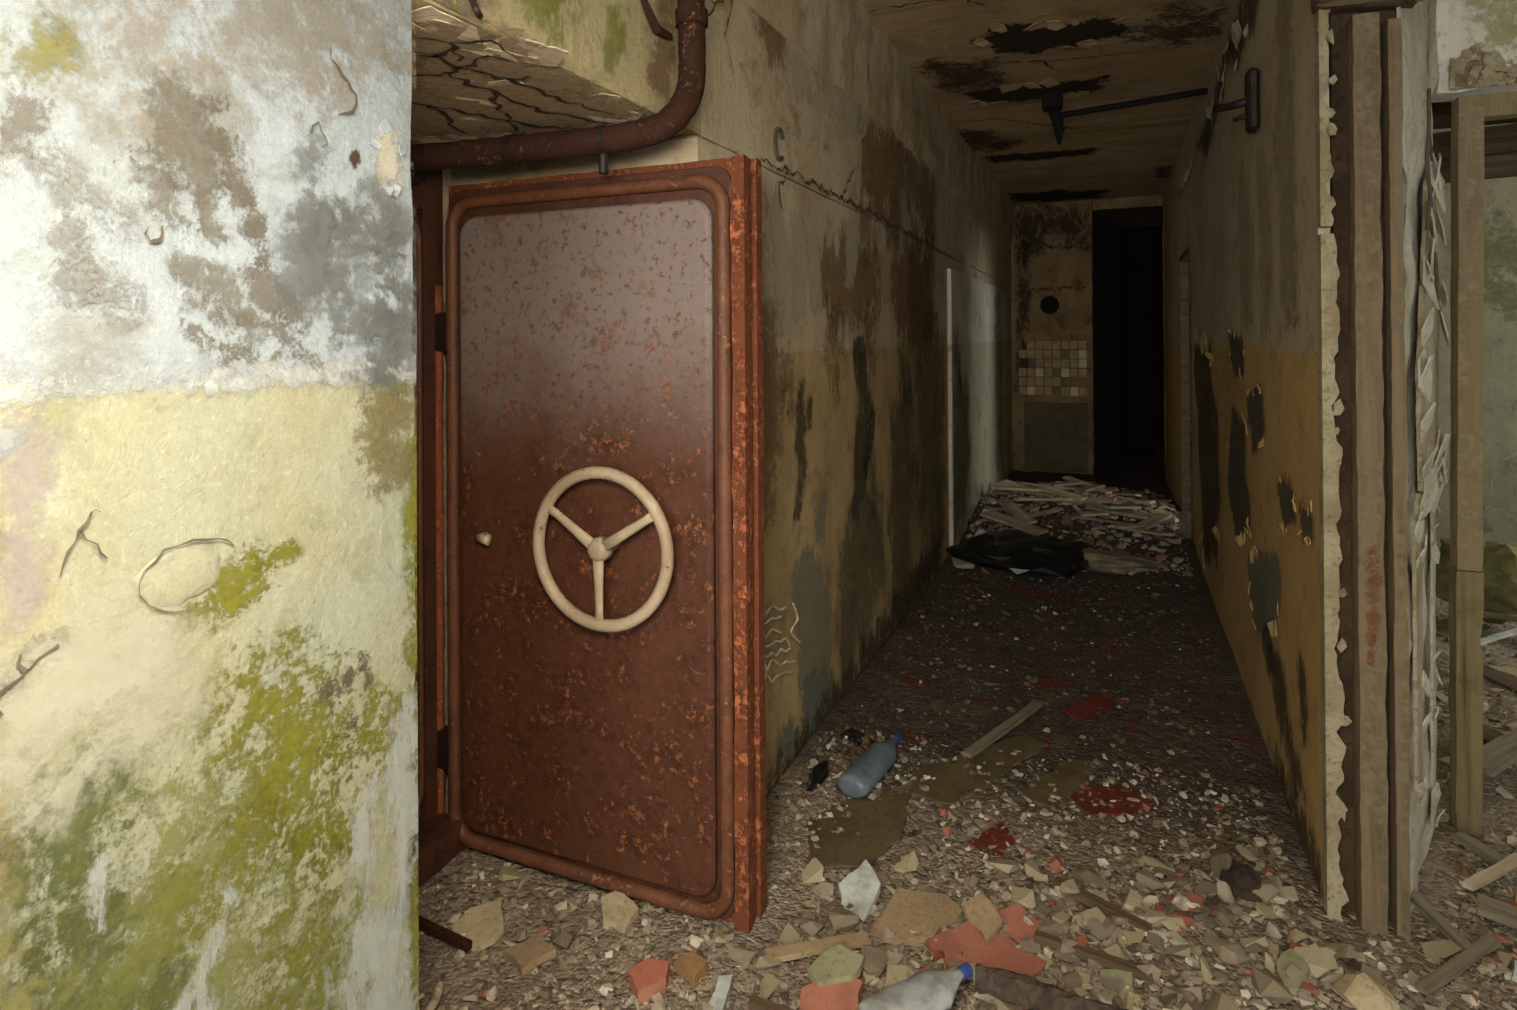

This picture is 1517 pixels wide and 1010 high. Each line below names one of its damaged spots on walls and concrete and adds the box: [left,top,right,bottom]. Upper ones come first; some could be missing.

crack [411,38,614,135]
spalling [970,17,1141,55]
damp [0,77,417,500]
crack [0,644,60,716]
crack [60,509,108,577]
crack [139,538,234,613]
damp [12,645,419,1010]
damp [252,539,301,576]
damp [766,121,961,797]
peeling [1194,329,1281,637]
flaking render [1277,9,1352,921]
flaking render [1412,152,1451,827]